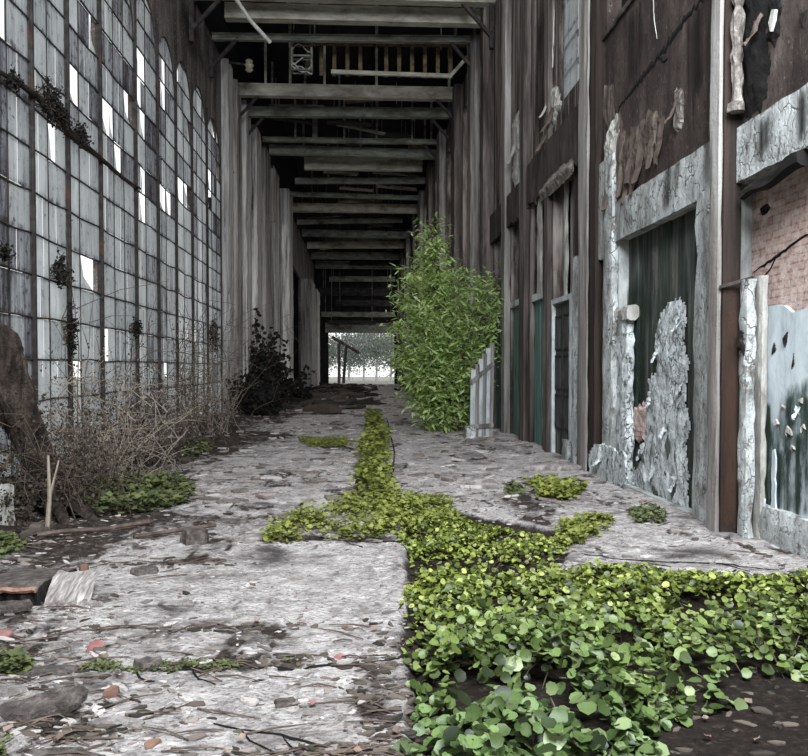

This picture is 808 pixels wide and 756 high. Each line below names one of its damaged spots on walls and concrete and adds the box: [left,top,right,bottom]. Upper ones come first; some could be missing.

peeling [601,84,685,211]
crack [754,234,808,275]
peeling [524,297,691,508]
water stain [764,383,808,515]